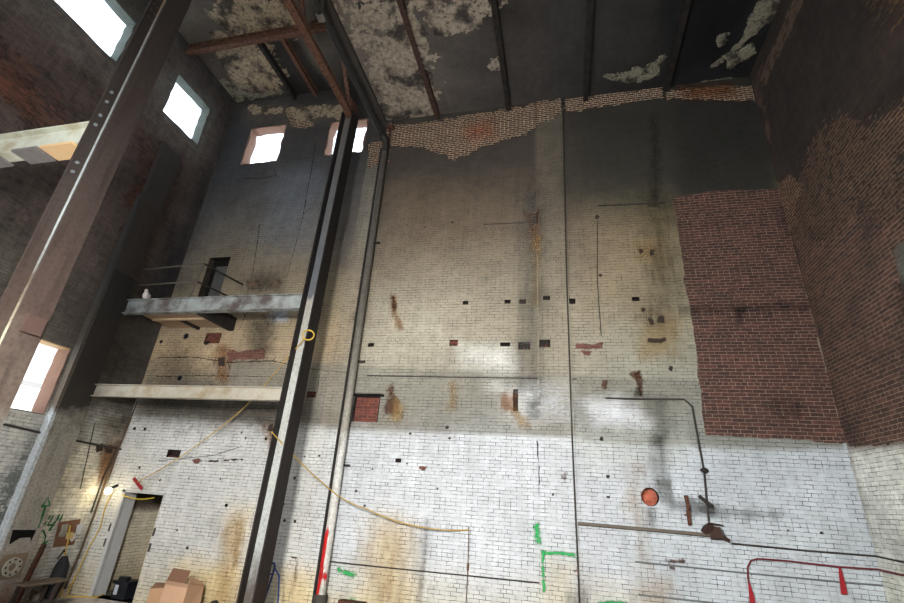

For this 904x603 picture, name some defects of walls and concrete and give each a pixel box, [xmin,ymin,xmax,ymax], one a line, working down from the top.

flaking render [332,0,803,168]
spalling [777,97,904,252]
rust [384,385,401,415]